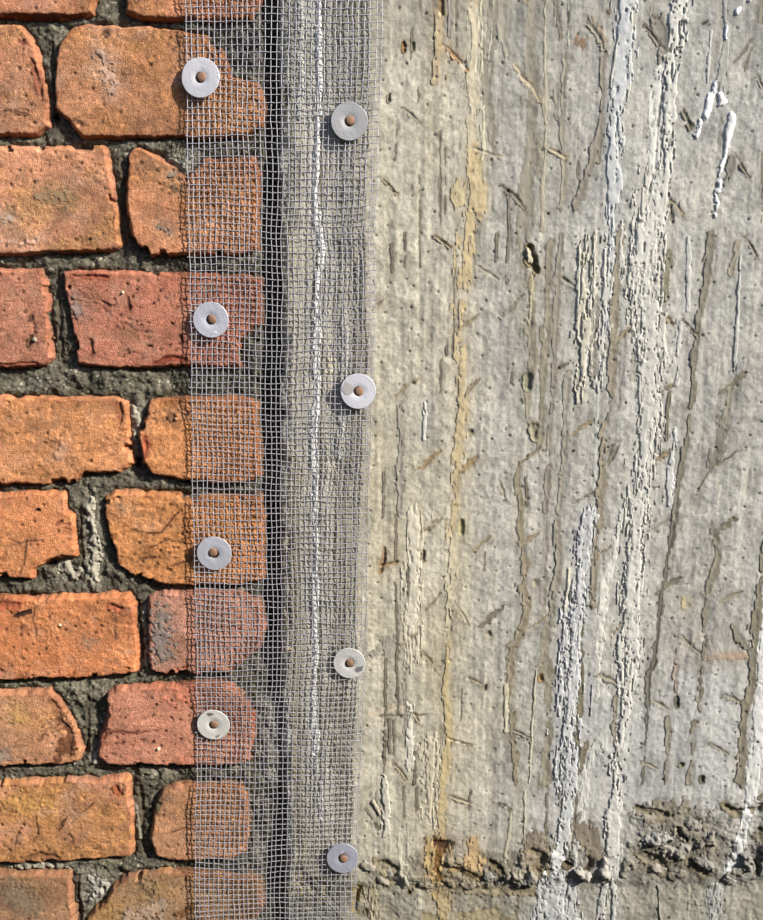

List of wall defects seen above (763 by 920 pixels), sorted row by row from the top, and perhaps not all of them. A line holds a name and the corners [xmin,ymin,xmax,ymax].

efflorescence [706,0,731,92]
leakage [724,154,737,187]
leakage [380,0,722,920]
leakage [362,403,446,831]
spalling [630,805,673,824]
spalling [719,793,763,818]
spalling [752,826,763,848]
spalling [372,856,402,889]
spalling [448,859,506,882]
spalling [520,844,592,875]
spalling [632,851,714,881]